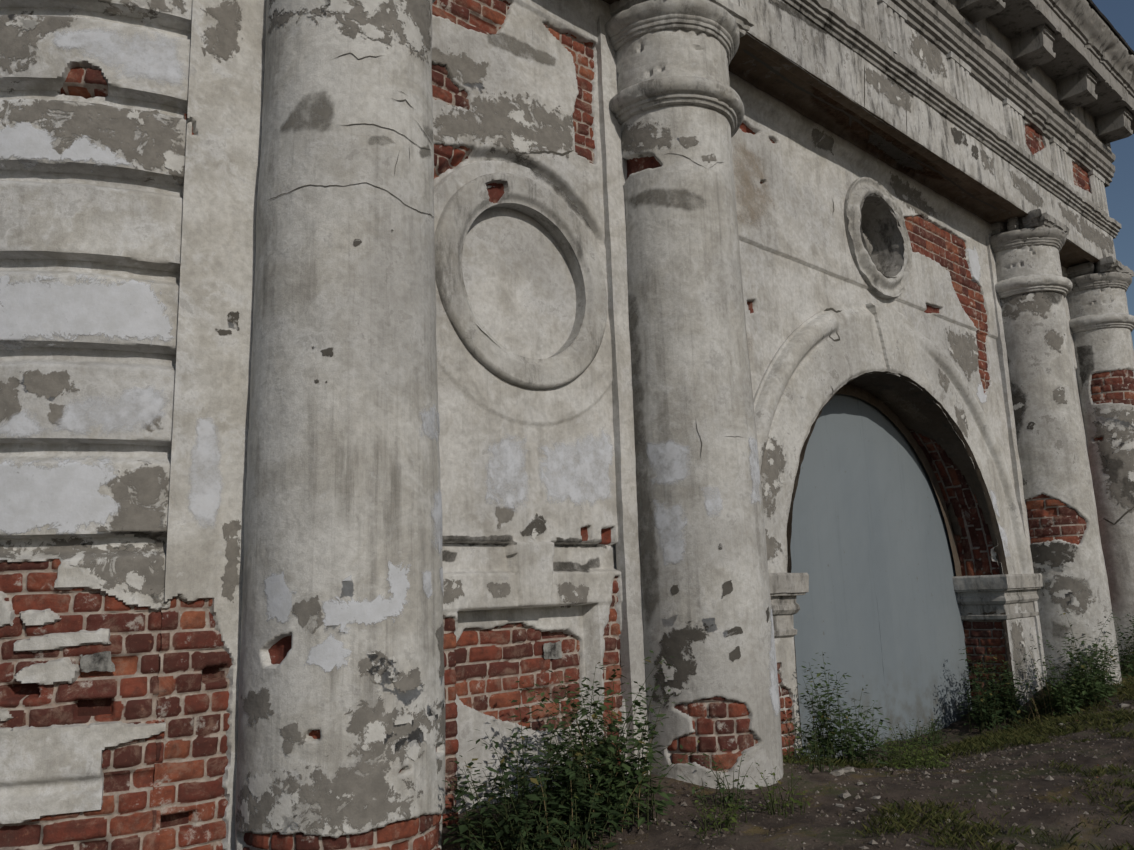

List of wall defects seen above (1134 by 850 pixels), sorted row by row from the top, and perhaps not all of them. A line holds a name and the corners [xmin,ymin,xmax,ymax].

peeling [0,6,194,185]
peeling [98,0,243,63]
crack [267,91,435,218]
peeling [268,0,595,179]
flaking render [889,172,990,393]
peeling [760,437,787,560]
flaking render [910,429,1000,576]
flaking render [1022,477,1096,617]
peeling [1091,369,1134,513]
flaking render [0,460,580,850]
flaking render [589,576,623,765]
flaking render [652,621,758,772]